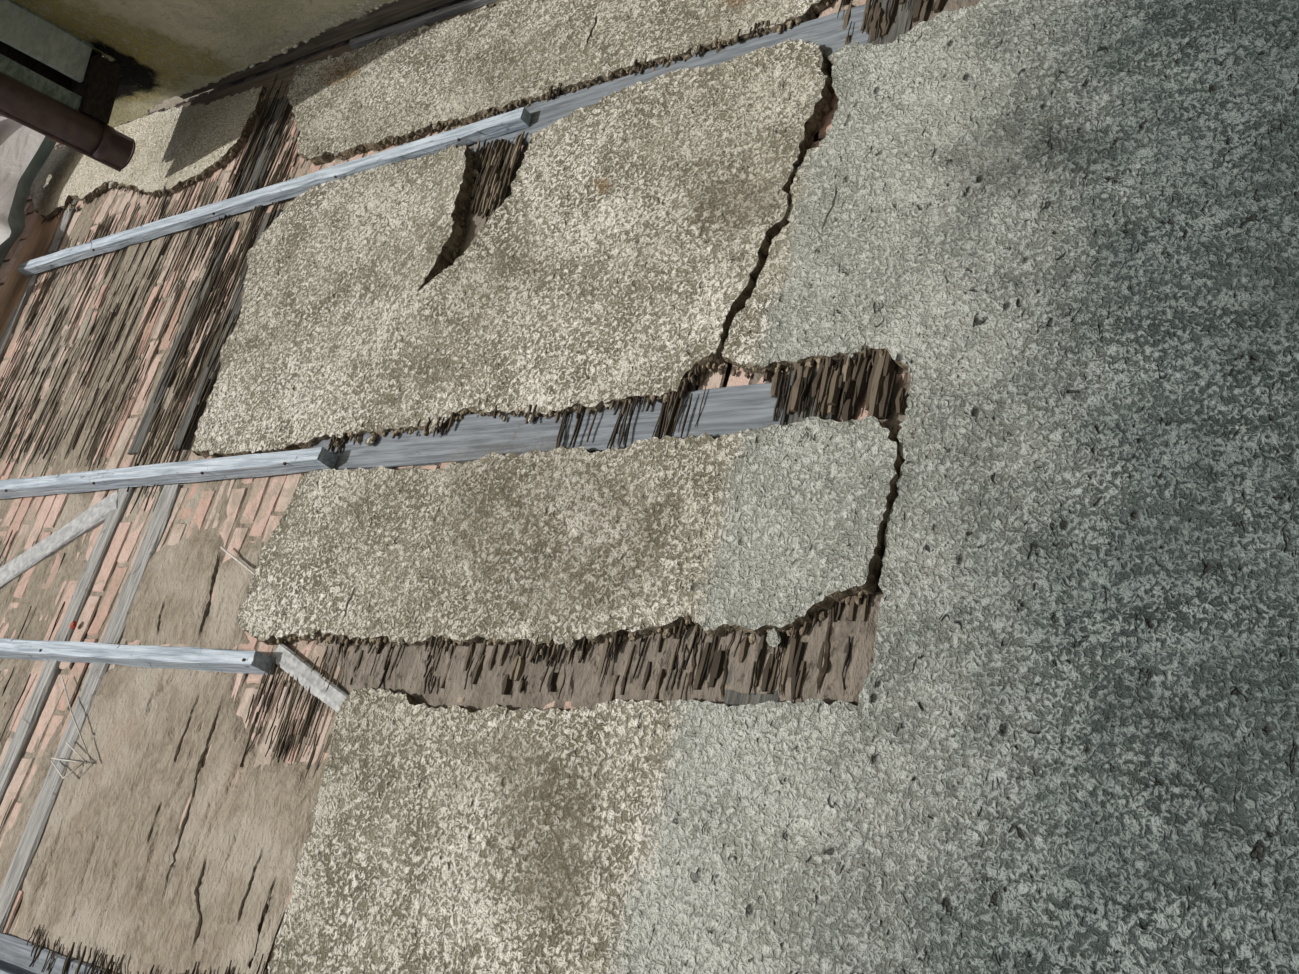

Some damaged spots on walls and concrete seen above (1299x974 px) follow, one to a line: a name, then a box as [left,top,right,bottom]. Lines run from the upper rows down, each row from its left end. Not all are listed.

leakage [12,0,227,100]
crack [827,62,839,111]
spalling [826,0,980,45]
spalling [0,20,801,479]
crack [821,185,837,230]
spalling [327,344,912,454]
spalling [0,475,884,974]